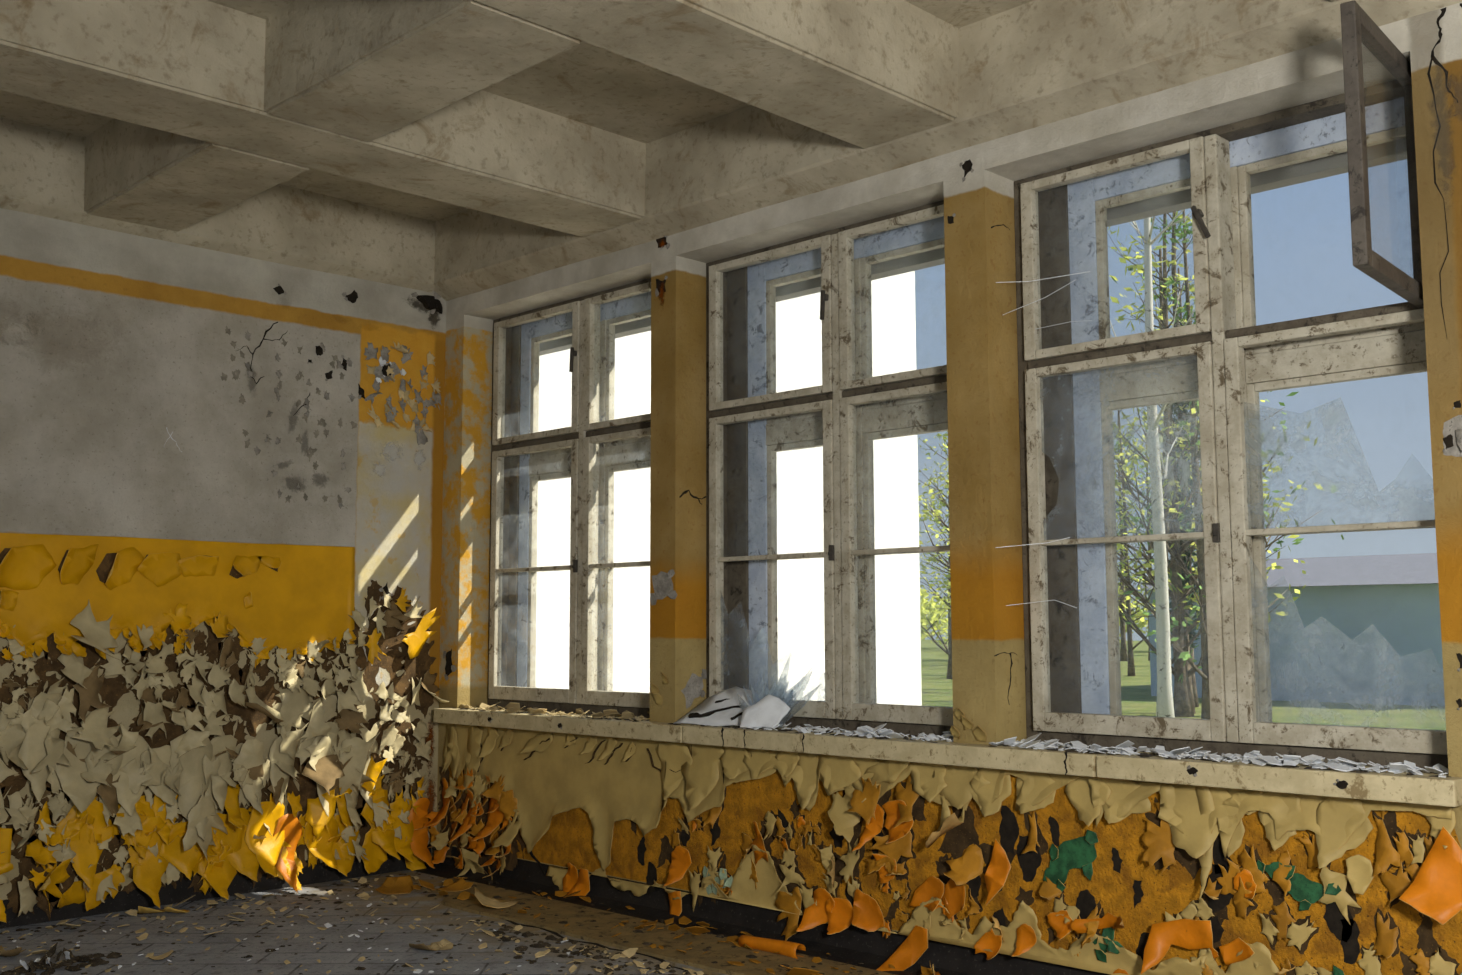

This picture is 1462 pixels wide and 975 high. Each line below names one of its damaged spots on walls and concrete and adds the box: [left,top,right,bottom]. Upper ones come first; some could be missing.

crack [1427,3,1462,337]
peeling [221,326,254,404]
peeling [242,338,441,470]
peeling [1443,400,1462,457]
peeling [0,533,1462,975]